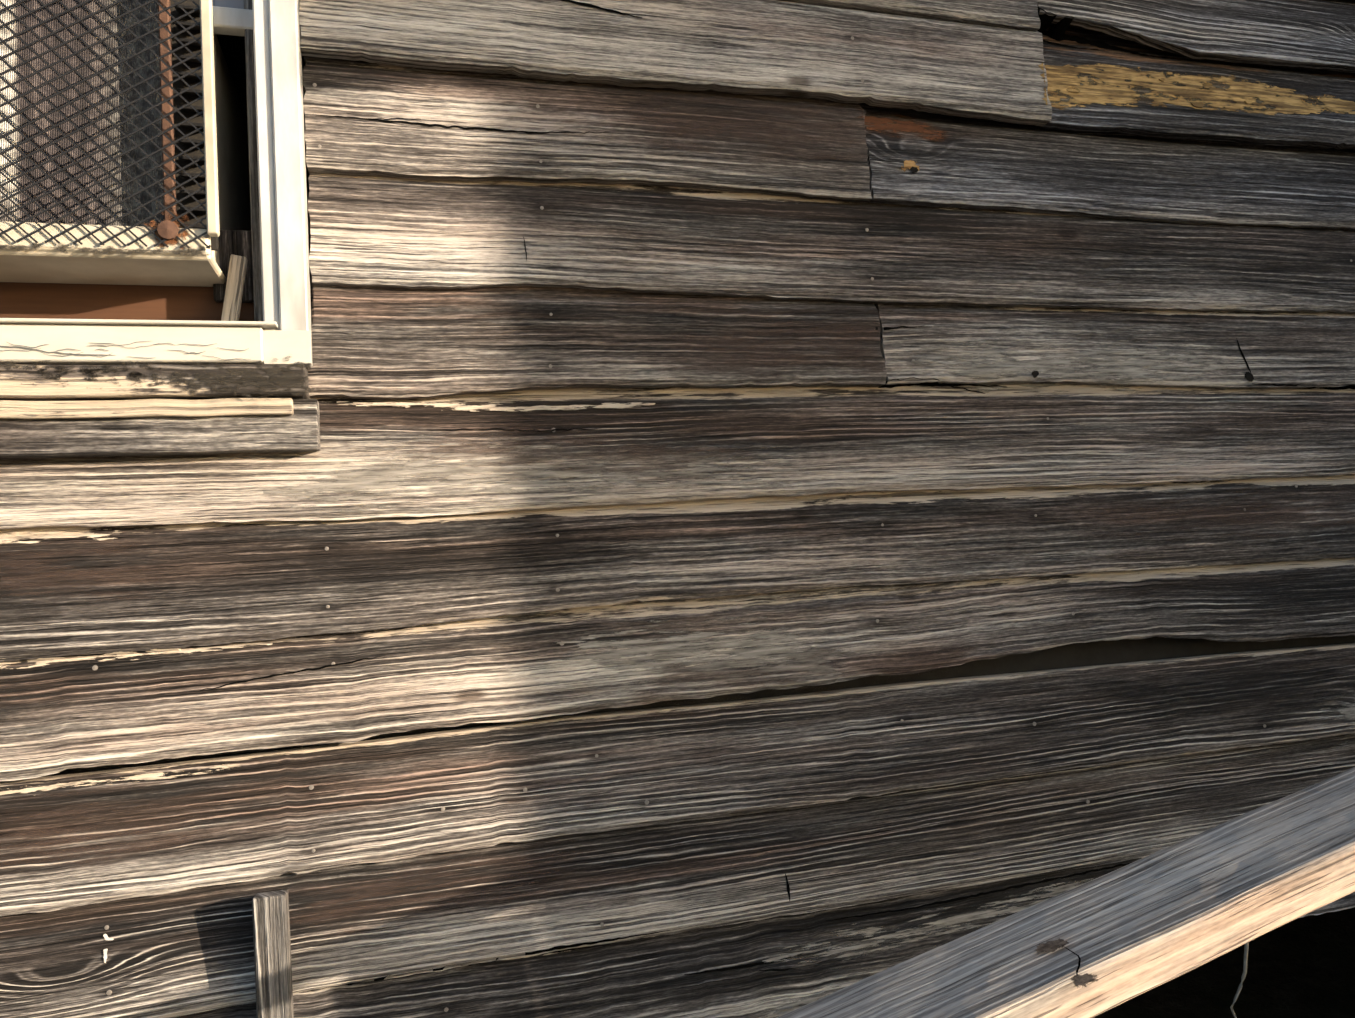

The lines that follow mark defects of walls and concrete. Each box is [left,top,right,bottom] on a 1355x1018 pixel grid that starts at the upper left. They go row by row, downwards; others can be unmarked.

crack [561,0,641,18]
corrosion [150,216,188,250]
crack [199,655,385,691]